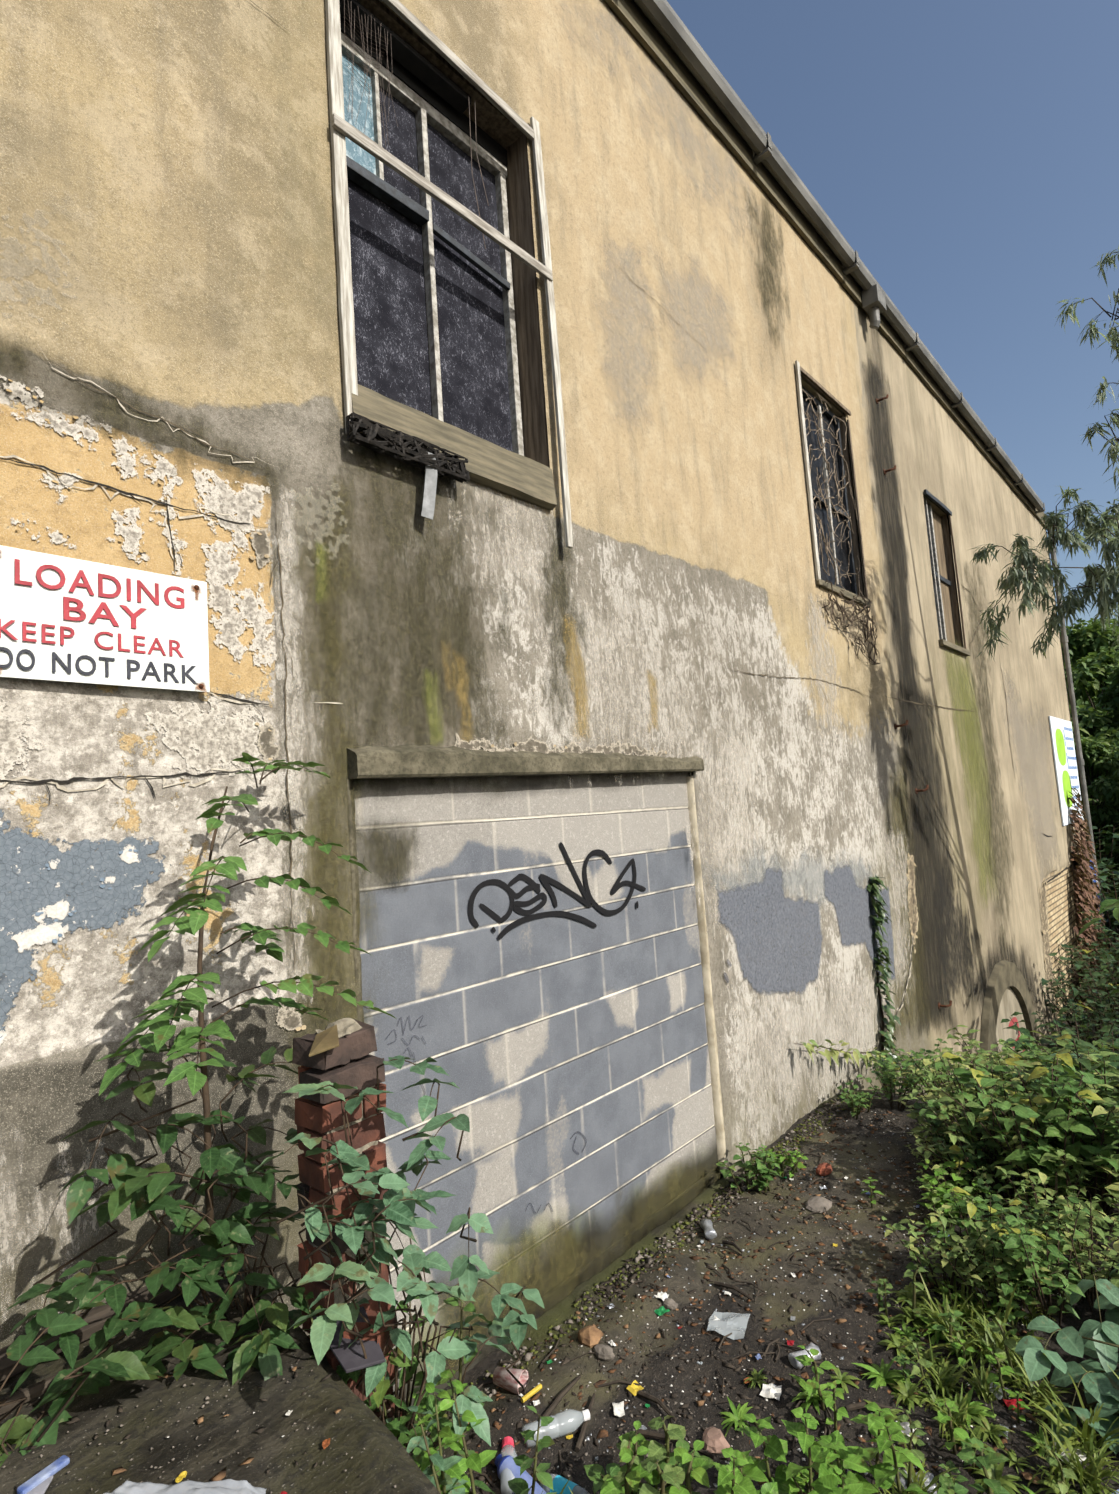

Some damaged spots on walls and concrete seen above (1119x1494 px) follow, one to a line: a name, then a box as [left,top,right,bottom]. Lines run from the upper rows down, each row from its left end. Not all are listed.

damp [751,207,783,332]
peeling [0,375,279,674]
crack [0,343,343,975]
peeling [0,695,44,788]
peeling [144,695,281,782]
damp [263,452,765,1029]
damp [727,362,1037,1140]
peeling [7,900,76,953]
peeling [100,844,141,890]
spalling [276,999,306,1031]
damp [449,1167,722,1336]